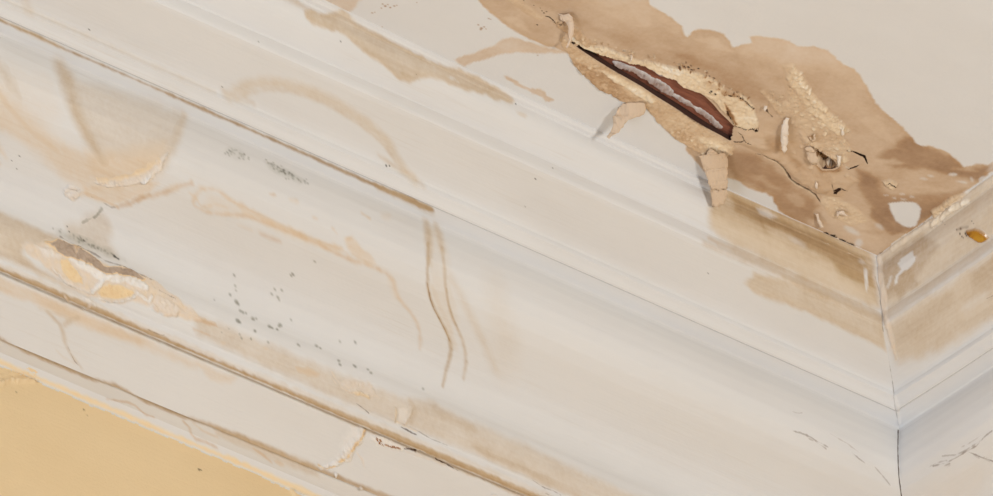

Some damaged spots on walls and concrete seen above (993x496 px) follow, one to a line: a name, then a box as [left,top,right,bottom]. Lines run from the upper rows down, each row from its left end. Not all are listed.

water stain [0,36,425,388]
water stain [0,0,428,194]
water stain [276,0,993,370]
flaking render [506,0,871,228]
peeling [316,424,406,478]
water stain [190,214,655,496]
crack [792,254,902,496]
crack [926,429,993,469]